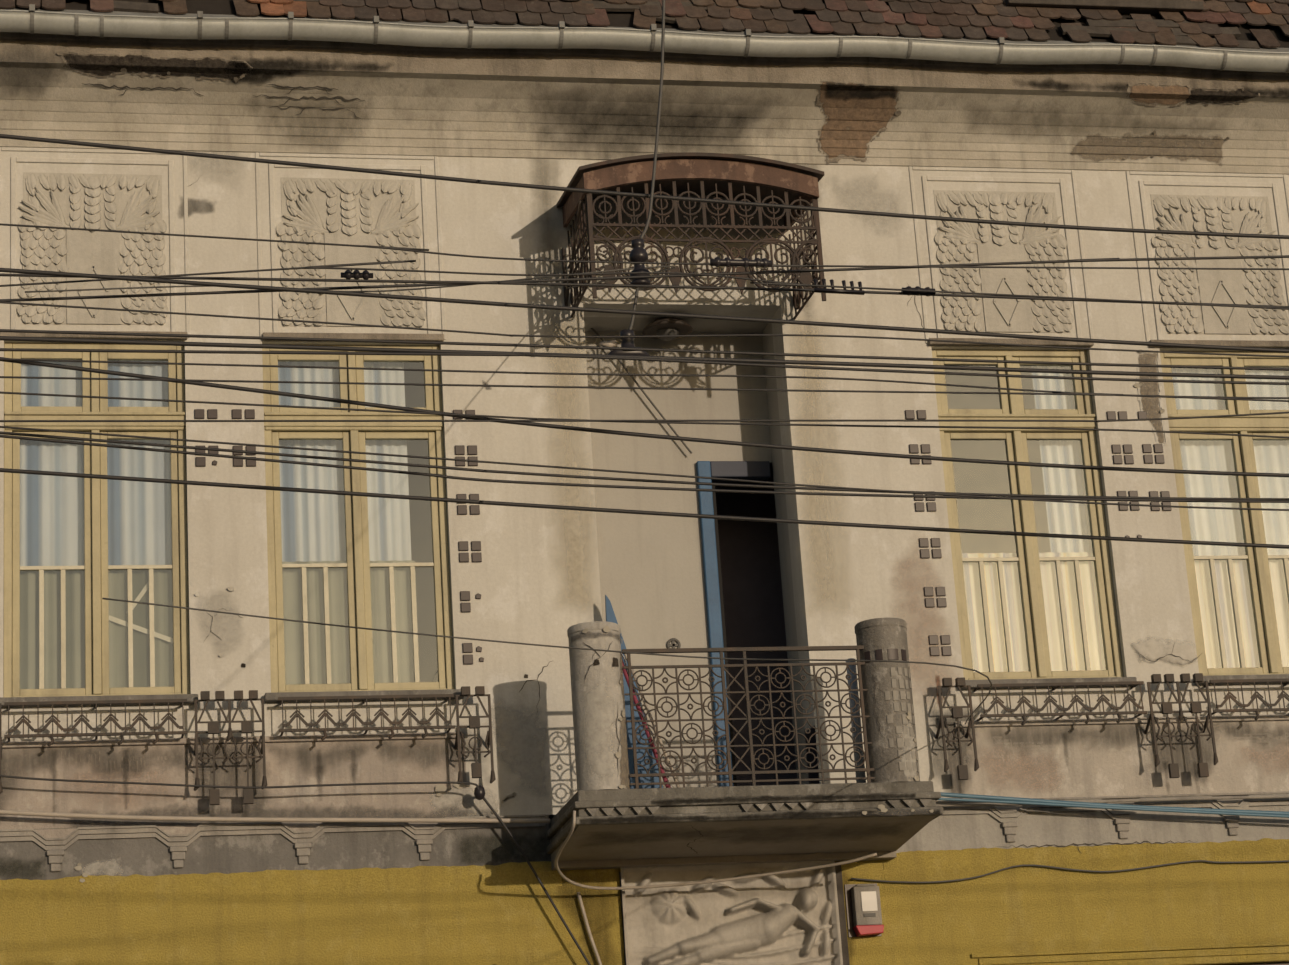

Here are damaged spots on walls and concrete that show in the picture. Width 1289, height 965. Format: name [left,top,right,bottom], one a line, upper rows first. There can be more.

flaking render [56,49,253,83]
crack [82,83,204,96]
crack [253,84,365,118]
flaking render [1126,82,1260,107]
flaking render [816,79,901,164]
flaking render [1071,130,1230,165]
flaking render [1134,349,1168,445]
crack [519,661,552,715]